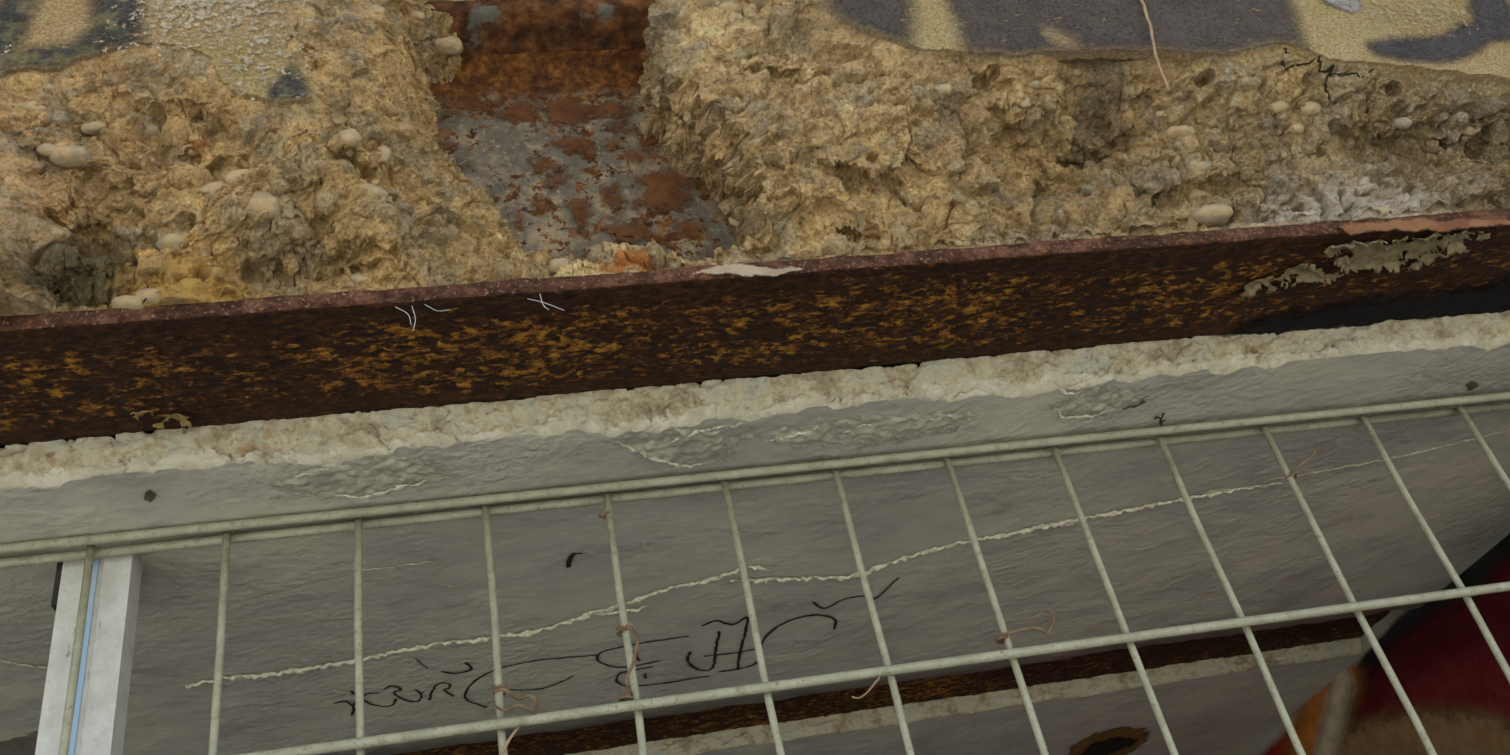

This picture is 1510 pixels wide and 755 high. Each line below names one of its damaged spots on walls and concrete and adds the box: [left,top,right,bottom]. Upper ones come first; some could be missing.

corrosion [443,94,708,273]
spalling [0,0,1510,316]
corrosion [1339,217,1510,235]
corrosion [130,410,192,429]
crack [185,428,1510,689]